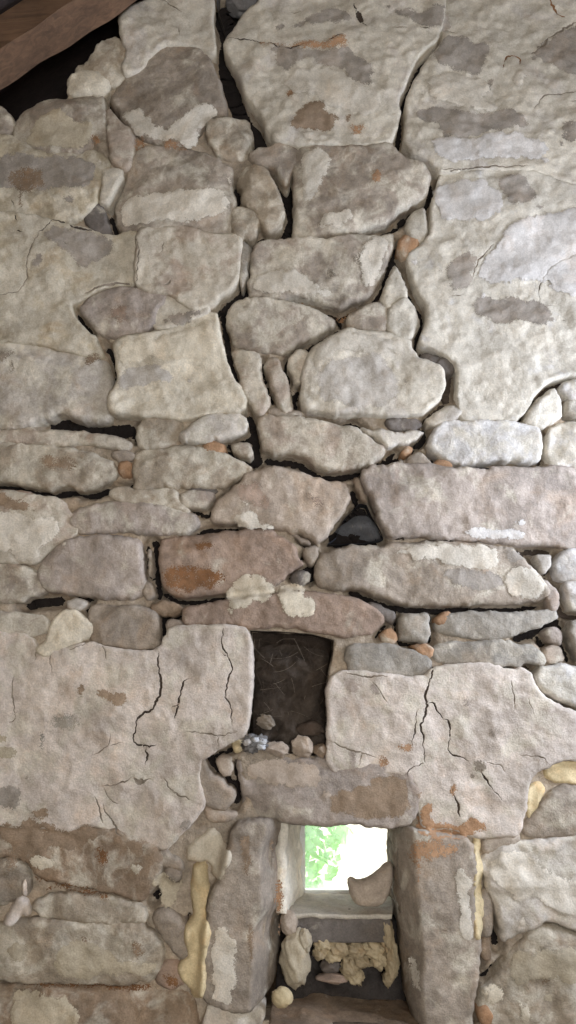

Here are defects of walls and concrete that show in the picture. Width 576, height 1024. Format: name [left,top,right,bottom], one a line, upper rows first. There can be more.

crack [94,631,238,836]
crack [331,741,374,759]
crack [347,673,387,702]
crack [407,667,549,798]